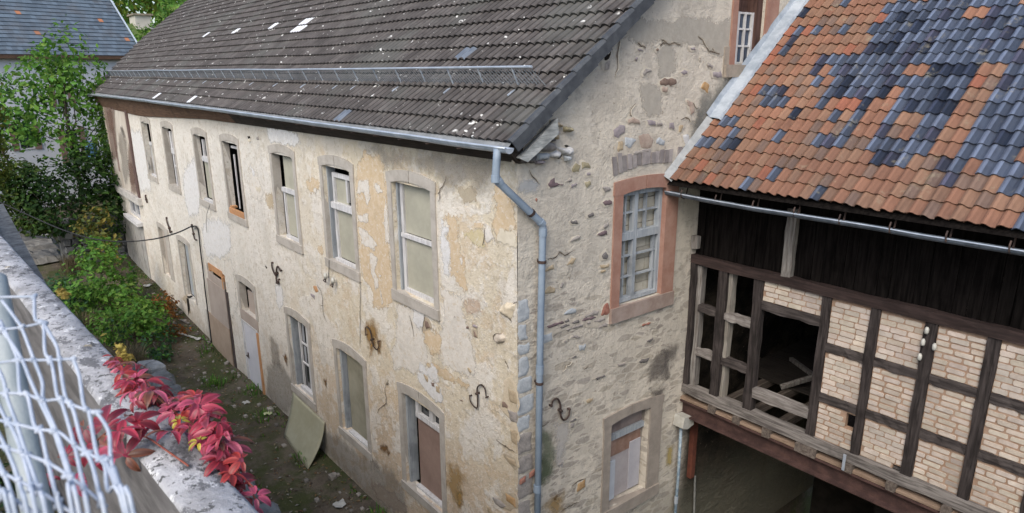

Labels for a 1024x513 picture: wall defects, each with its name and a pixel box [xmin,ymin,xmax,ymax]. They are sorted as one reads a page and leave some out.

peeling [356,149,517,402]
corrosion [366,324,381,353]
water stain [651,346,677,379]